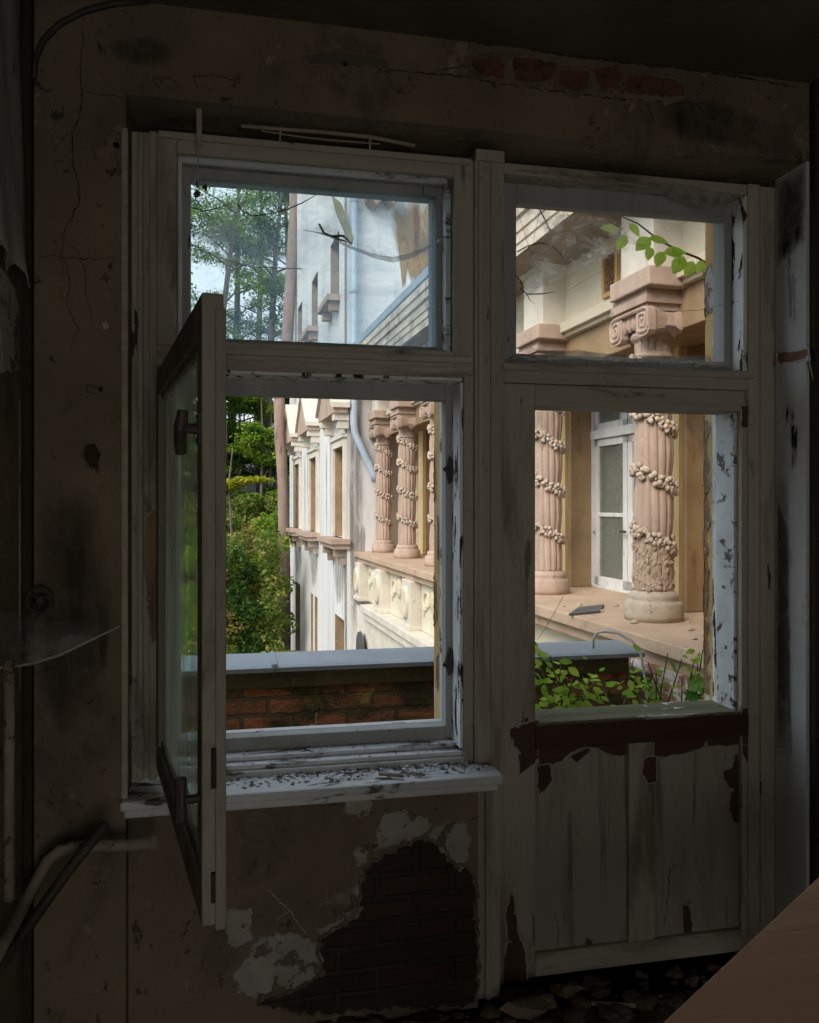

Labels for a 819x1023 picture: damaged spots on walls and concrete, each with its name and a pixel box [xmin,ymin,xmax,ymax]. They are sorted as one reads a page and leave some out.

crack [389,43,800,124]
crack [41,16,132,347]
peeling [226,370,492,788]
peeling [509,719,627,795]
peeling [641,736,749,825]
flaking render [225,800,483,1018]
peeling [502,892,529,985]